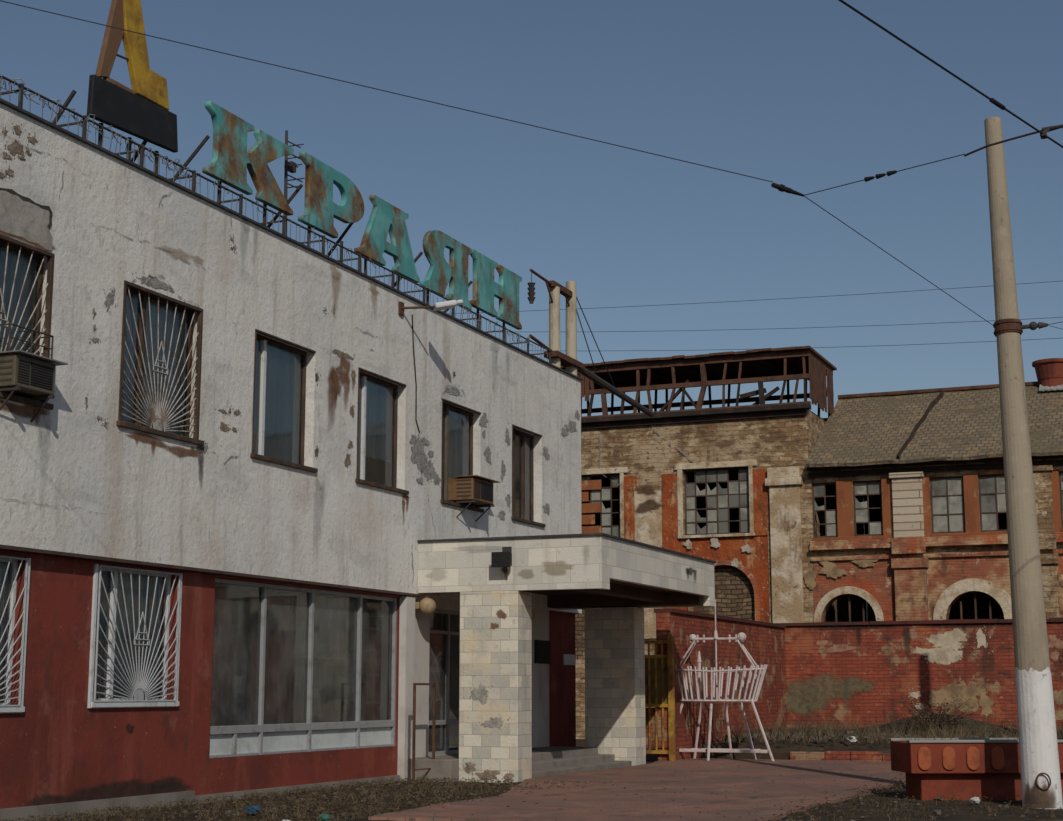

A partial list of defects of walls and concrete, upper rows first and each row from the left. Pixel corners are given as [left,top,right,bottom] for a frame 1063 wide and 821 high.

spalling [0,123,53,251]
rust [329,357,356,411]
rust [128,432,199,457]
spalling [397,432,441,488]
peeling [912,644,963,665]
peeling [976,628,987,648]
leakage [787,675,873,714]